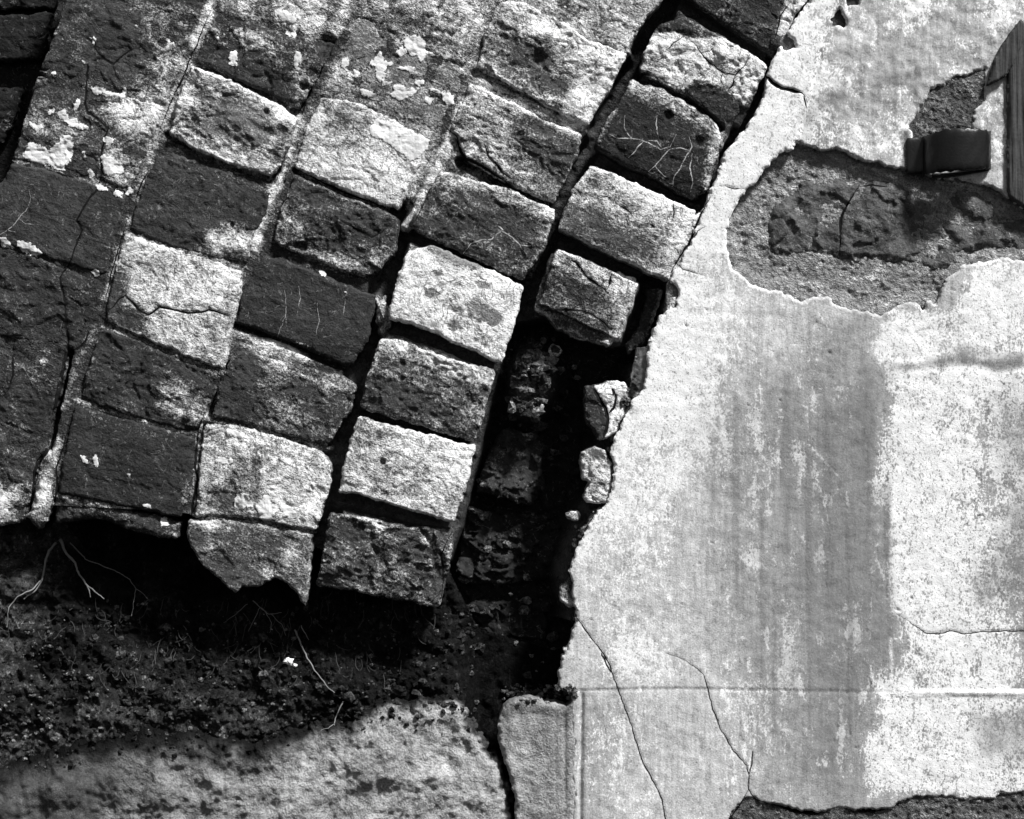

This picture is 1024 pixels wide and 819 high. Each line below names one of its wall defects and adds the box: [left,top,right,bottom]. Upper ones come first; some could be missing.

crack [159,4,214,132]
spalling [909,68,985,138]
crack [25,34,229,522]
spalling [726,144,1024,316]
spalling [497,334,581,461]
spalling [621,344,649,406]
spalling [480,534,511,553]
crack [897,614,1024,634]
crack [577,618,666,819]
crack [667,653,784,819]
water stain [886,688,1024,698]
spalling [729,791,1024,819]